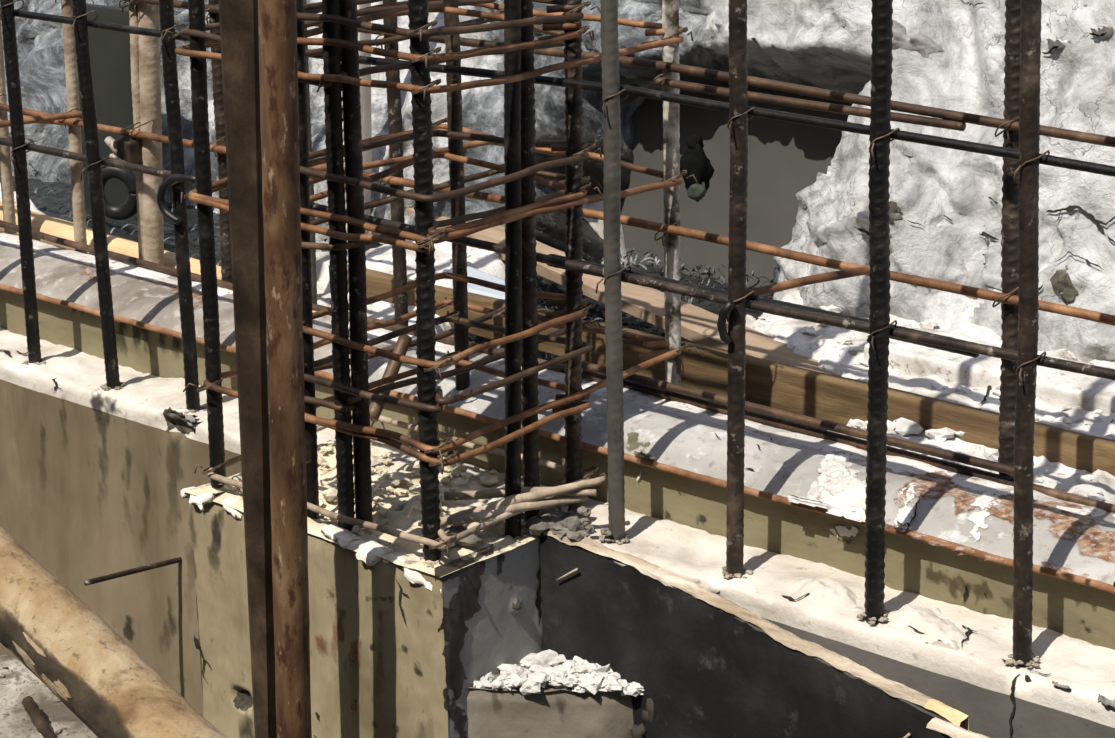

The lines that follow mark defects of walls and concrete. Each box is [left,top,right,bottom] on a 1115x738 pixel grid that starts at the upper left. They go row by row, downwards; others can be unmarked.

crack [1046,205,1115,243]
crack [1055,251,1104,270]
leakage [91,395,115,447]
corrosion [894,471,1014,524]
leakage [210,512,221,558]
corrosion [886,525,1005,562]
corrosion [1033,500,1115,562]
leakage [124,616,133,640]
crack [1002,659,1052,738]